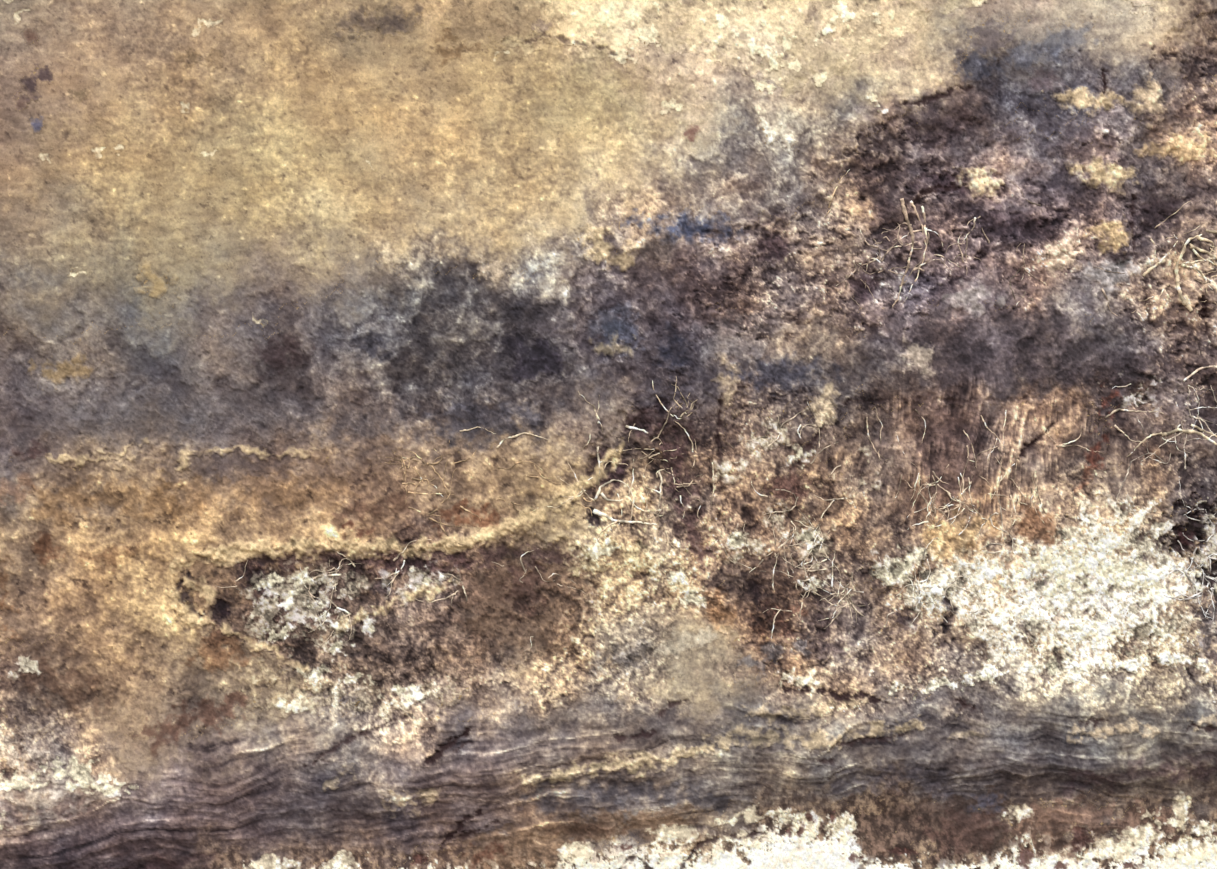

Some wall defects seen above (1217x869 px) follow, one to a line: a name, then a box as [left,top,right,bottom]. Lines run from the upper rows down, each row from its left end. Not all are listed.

leakage [23,28,39,46]
leakage [12,63,54,133]
leakage [173,45,224,71]
leakage [332,0,423,44]
leakage [434,0,566,67]
leakage [680,123,701,142]
leakage [909,5,1188,147]
leakage [0,203,1186,507]
leakage [555,511,870,702]
leakage [712,489,1217,704]
leakage [0,655,44,682]
leakage [227,557,470,734]